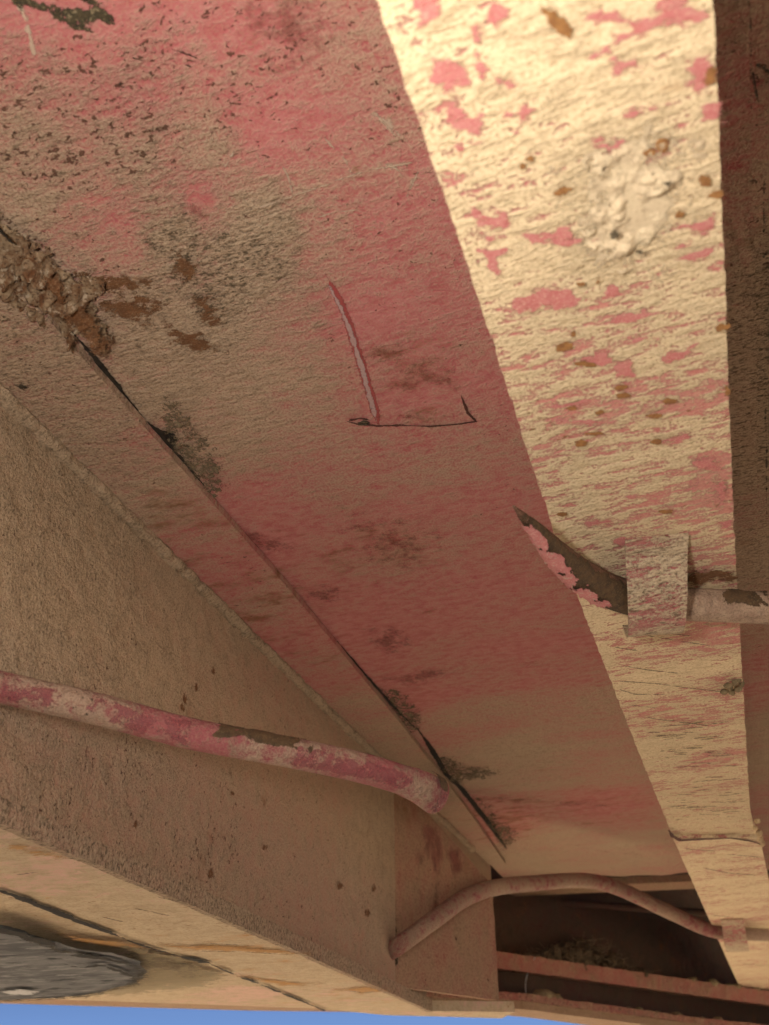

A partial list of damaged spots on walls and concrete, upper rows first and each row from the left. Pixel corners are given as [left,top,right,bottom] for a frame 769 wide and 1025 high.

peeling [412,0,442,29]
peeling [423,1,524,158]
peeling [583,0,710,78]
peeling [685,54,727,124]
crack [748,0,760,111]
peeling [470,207,511,281]
peeling [521,226,599,251]
peeling [672,212,724,264]
peeling [511,282,588,315]
spalling [325,274,380,424]
peeling [517,513,628,615]
crack [615,634,761,875]